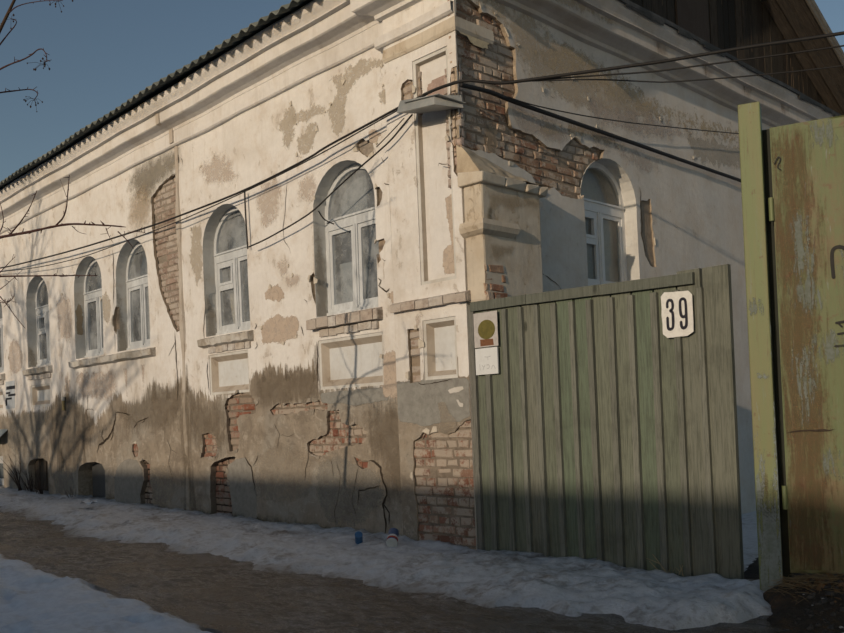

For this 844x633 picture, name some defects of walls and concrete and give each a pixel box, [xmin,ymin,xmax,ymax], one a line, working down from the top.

spalling [403,0,740,274]
spalling [150,176,180,331]
peeling [189,226,203,285]
spalling [483,263,508,300]
crack [97,412,148,451]
spalling [199,390,259,514]
spalling [271,398,367,460]
crack [330,459,390,534]
spalling [410,420,476,550]